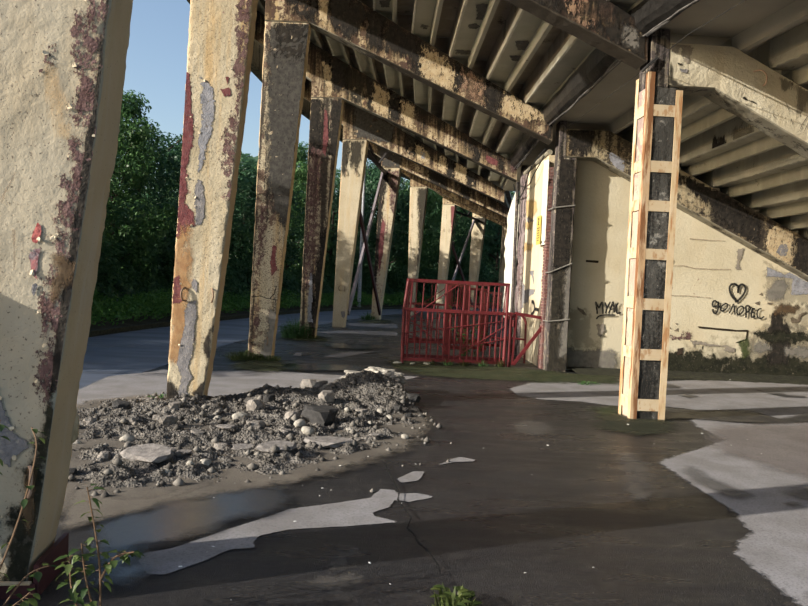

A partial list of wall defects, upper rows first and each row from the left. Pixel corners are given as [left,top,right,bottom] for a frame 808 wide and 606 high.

peeling [176,0,252,239]
peeling [29,0,109,414]
peeling [755,225,808,305]
leakage [791,235,808,275]
spalling [172,275,197,397]
leakage [668,304,808,376]
spalling [0,396,29,467]